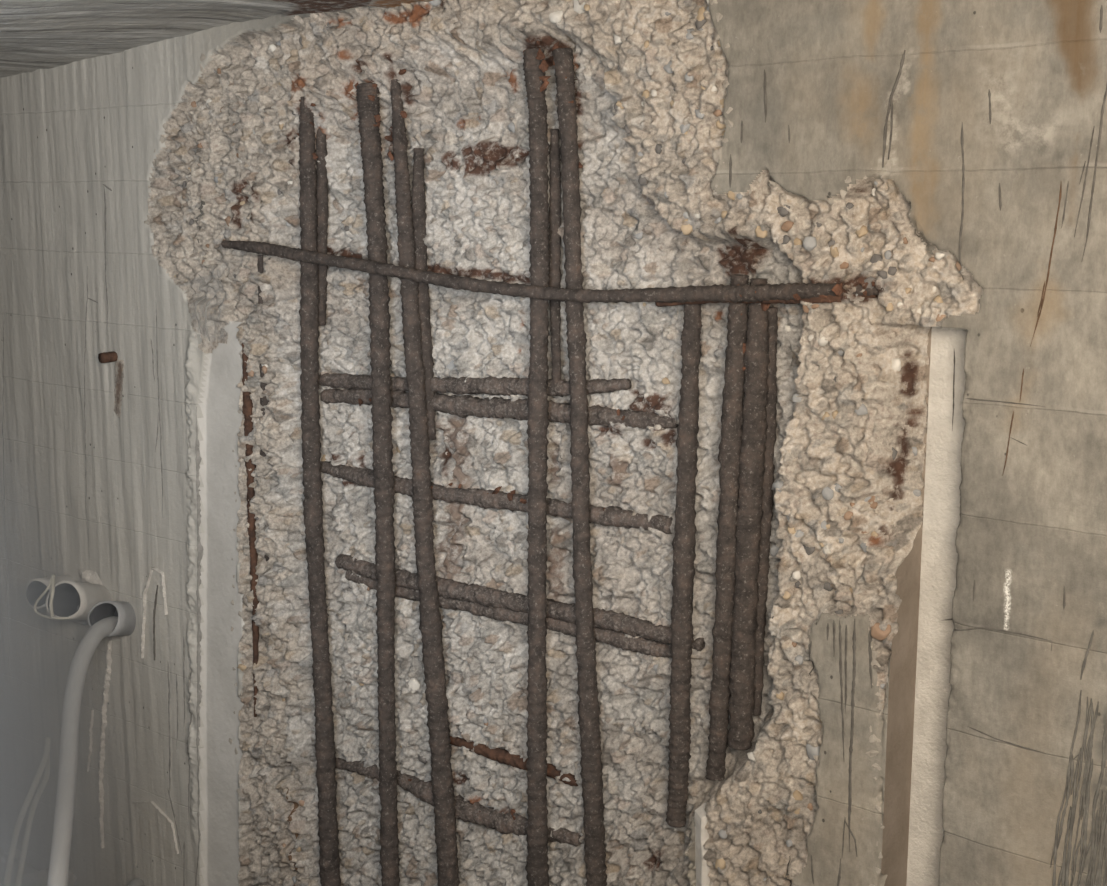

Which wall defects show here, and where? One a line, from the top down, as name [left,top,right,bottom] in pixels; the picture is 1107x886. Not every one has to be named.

corrosion [277,73,334,172]
corrosion [331,45,418,163]
corrosion [423,113,530,200]
corrosion [427,261,531,285]
corrosion [712,225,775,279]
crack [952,84,1107,476]
corrosion [435,412,479,489]
spalling [144,0,983,886]
corrosion [592,385,678,497]
corrosion [864,348,927,548]
corrosion [433,500,472,584]
peeling [138,553,170,666]